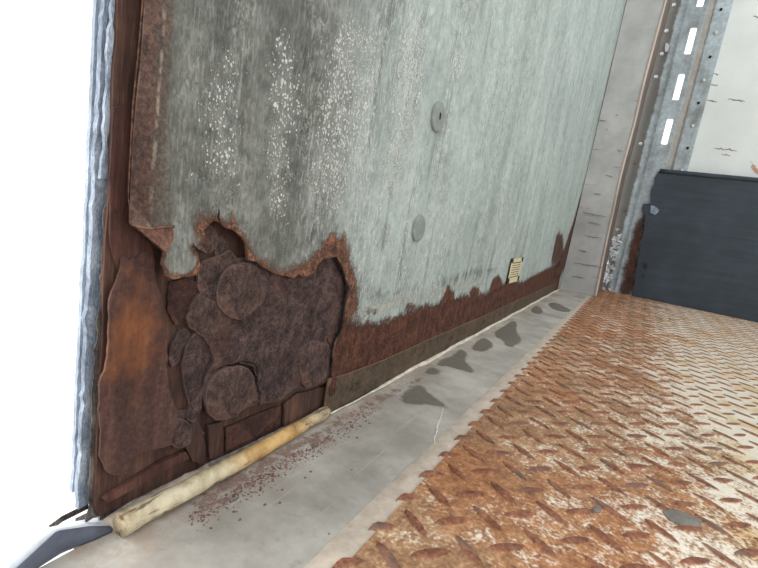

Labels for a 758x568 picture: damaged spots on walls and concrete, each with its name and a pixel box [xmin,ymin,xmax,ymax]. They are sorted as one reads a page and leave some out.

corrosion [166,196,581,448]
water stain [427,322,520,374]
water stain [532,303,570,314]
water stain [403,386,443,406]
corrosion [192,389,400,518]